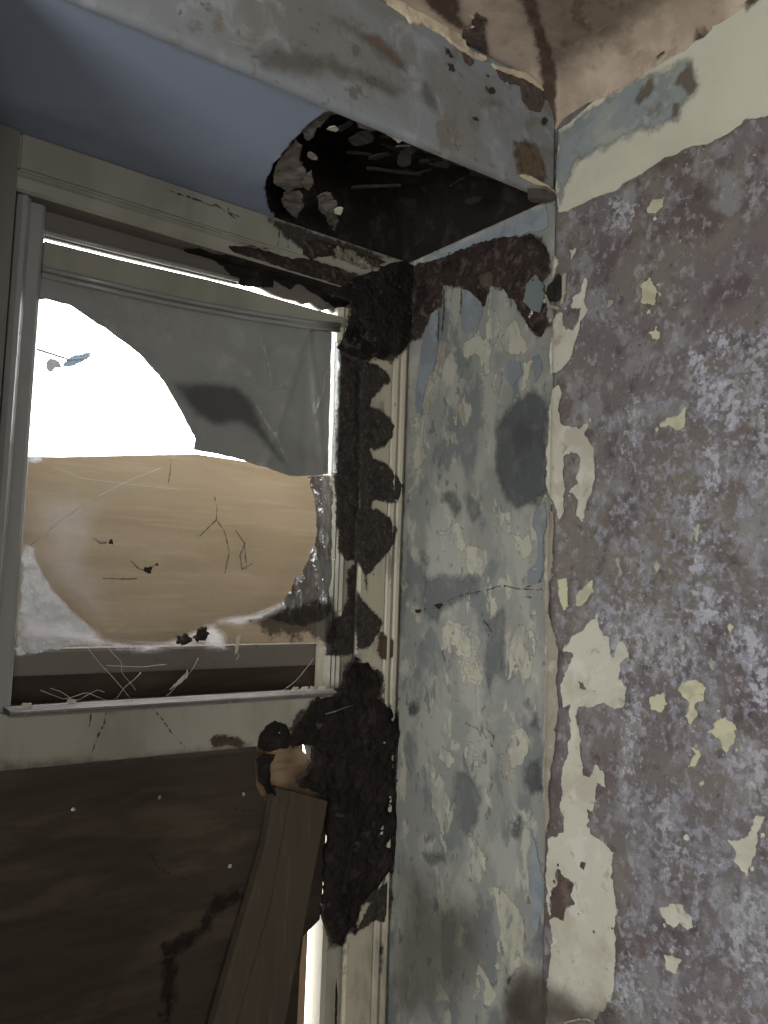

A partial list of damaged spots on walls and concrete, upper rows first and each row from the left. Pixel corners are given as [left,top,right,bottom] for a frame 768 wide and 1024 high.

damp [426,0,463,29]
damp [549,0,651,62]
peeling [427,0,768,262]
peeling [273,111,481,231]
damp [496,393,547,508]
peeling [462,248,629,1024]
peeling [649,693,667,712]
peeling [678,680,706,732]
peeling [708,710,739,755]
peeling [728,815,765,876]
peeling [659,903,695,931]
peeling [664,949,682,974]